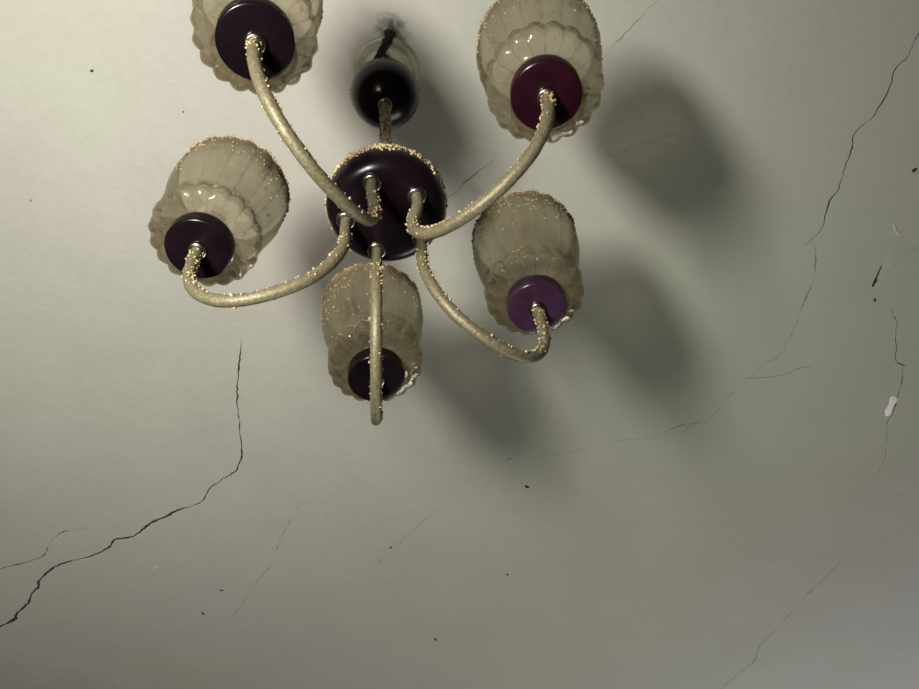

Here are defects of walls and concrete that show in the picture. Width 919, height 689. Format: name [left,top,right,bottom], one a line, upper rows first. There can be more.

crack [543,33,919,474]
crack [0,343,243,627]
flaking render [885,396,898,416]